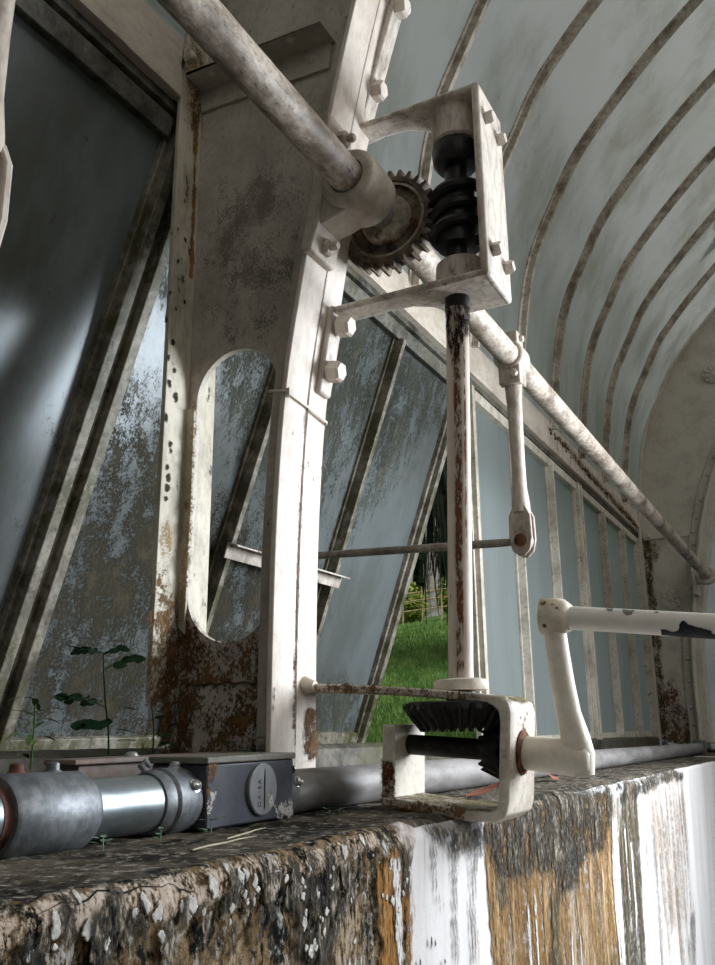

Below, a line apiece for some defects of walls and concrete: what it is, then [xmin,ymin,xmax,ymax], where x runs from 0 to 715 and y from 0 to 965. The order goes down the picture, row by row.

corrosion [187,43,205,278]
corrosion [139,402,259,755]
corrosion [642,538,661,611]
corrosion [652,635,691,745]
water stain [8,922,50,965]
water stain [59,892,78,950]
water stain [91,883,149,965]
water stain [161,896,190,964]
water stain [202,865,240,960]
water stain [255,846,357,965]
water stain [424,768,684,965]
water stain [677,891,696,965]